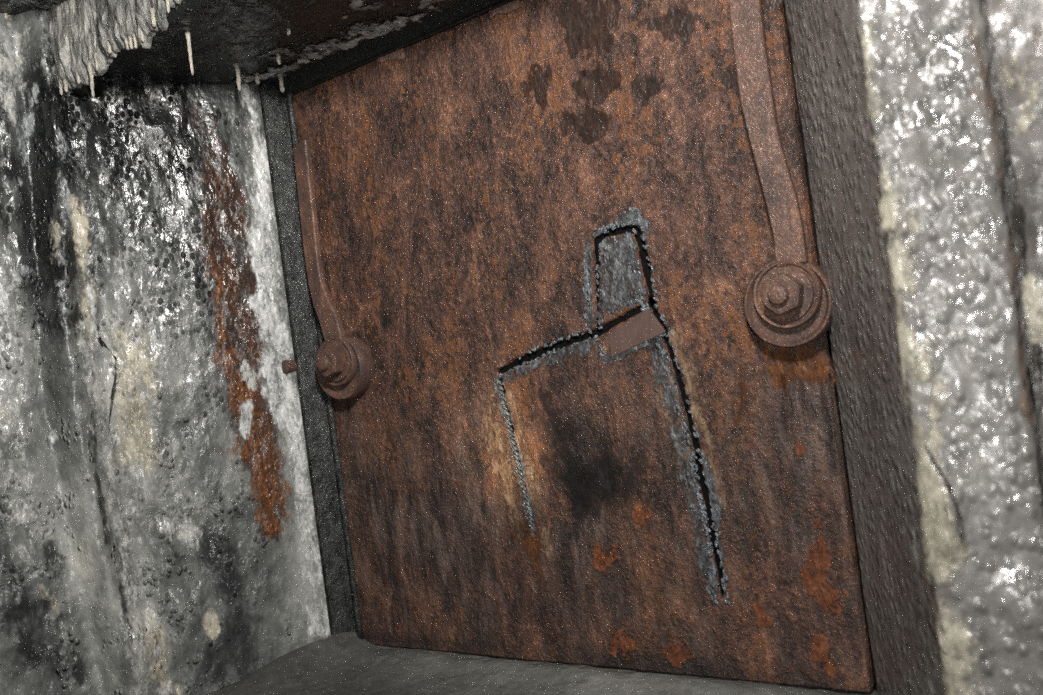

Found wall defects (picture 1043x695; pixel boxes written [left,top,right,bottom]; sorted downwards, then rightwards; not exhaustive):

efflorescence [862,27,879,118]
damp [0,23,98,343]
corrosion [193,103,291,541]
efflorescence [1022,274,1043,344]
corrosion [764,344,836,395]
damp [879,162,977,695]
damp [92,434,135,640]
damp [126,481,199,550]
corrosion [592,541,618,573]
corrosion [800,518,849,615]
corrosion [608,629,636,660]
corrosion [810,634,837,678]